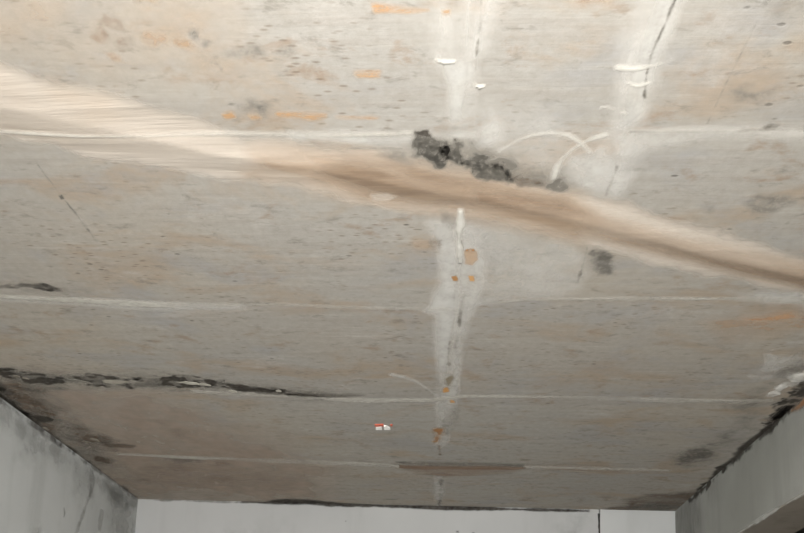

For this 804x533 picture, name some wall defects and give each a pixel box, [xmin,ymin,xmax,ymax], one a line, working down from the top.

leakage [437,60,485,119]
leakage [616,0,677,122]
crack [6,283,59,292]
leakage [264,130,585,369]
leakage [590,250,612,274]
leakage [690,254,804,286]
leakage [0,368,350,533]
leakage [392,462,526,506]